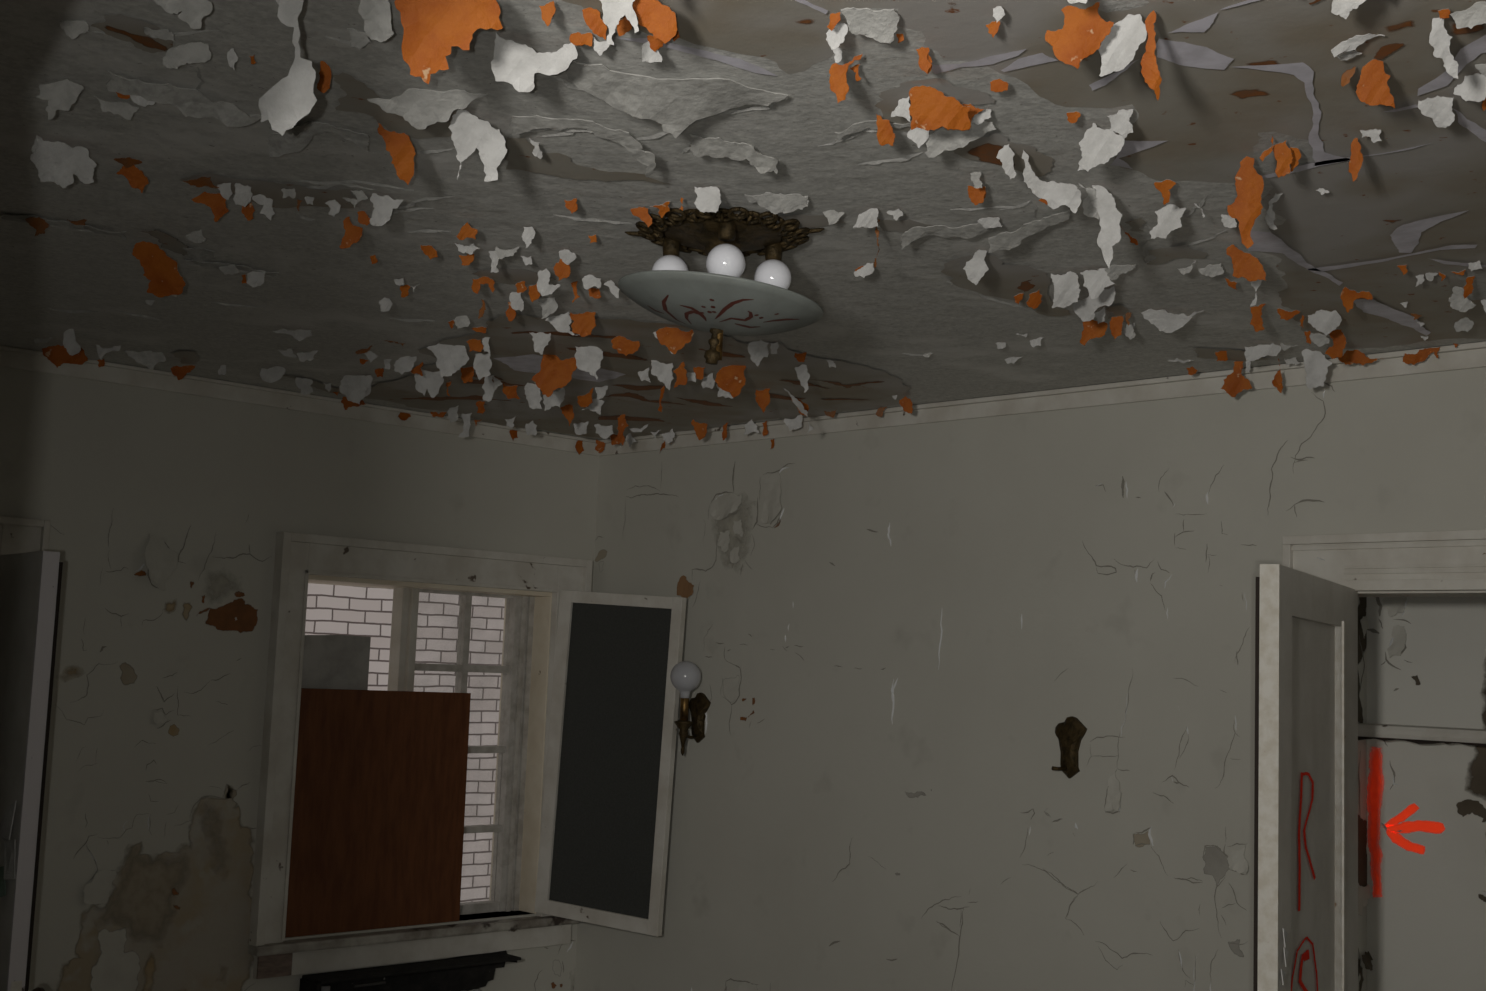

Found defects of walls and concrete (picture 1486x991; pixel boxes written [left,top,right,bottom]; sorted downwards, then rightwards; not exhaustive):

flaking render [30,0,1486,397]
flaking render [260,222,913,455]
flaking render [199,591,258,633]
crack [1082,465,1257,619]
crack [1155,596,1249,804]
crack [1267,390,1326,517]
flaking render [1456,746,1486,822]
crack [924,808,1217,991]